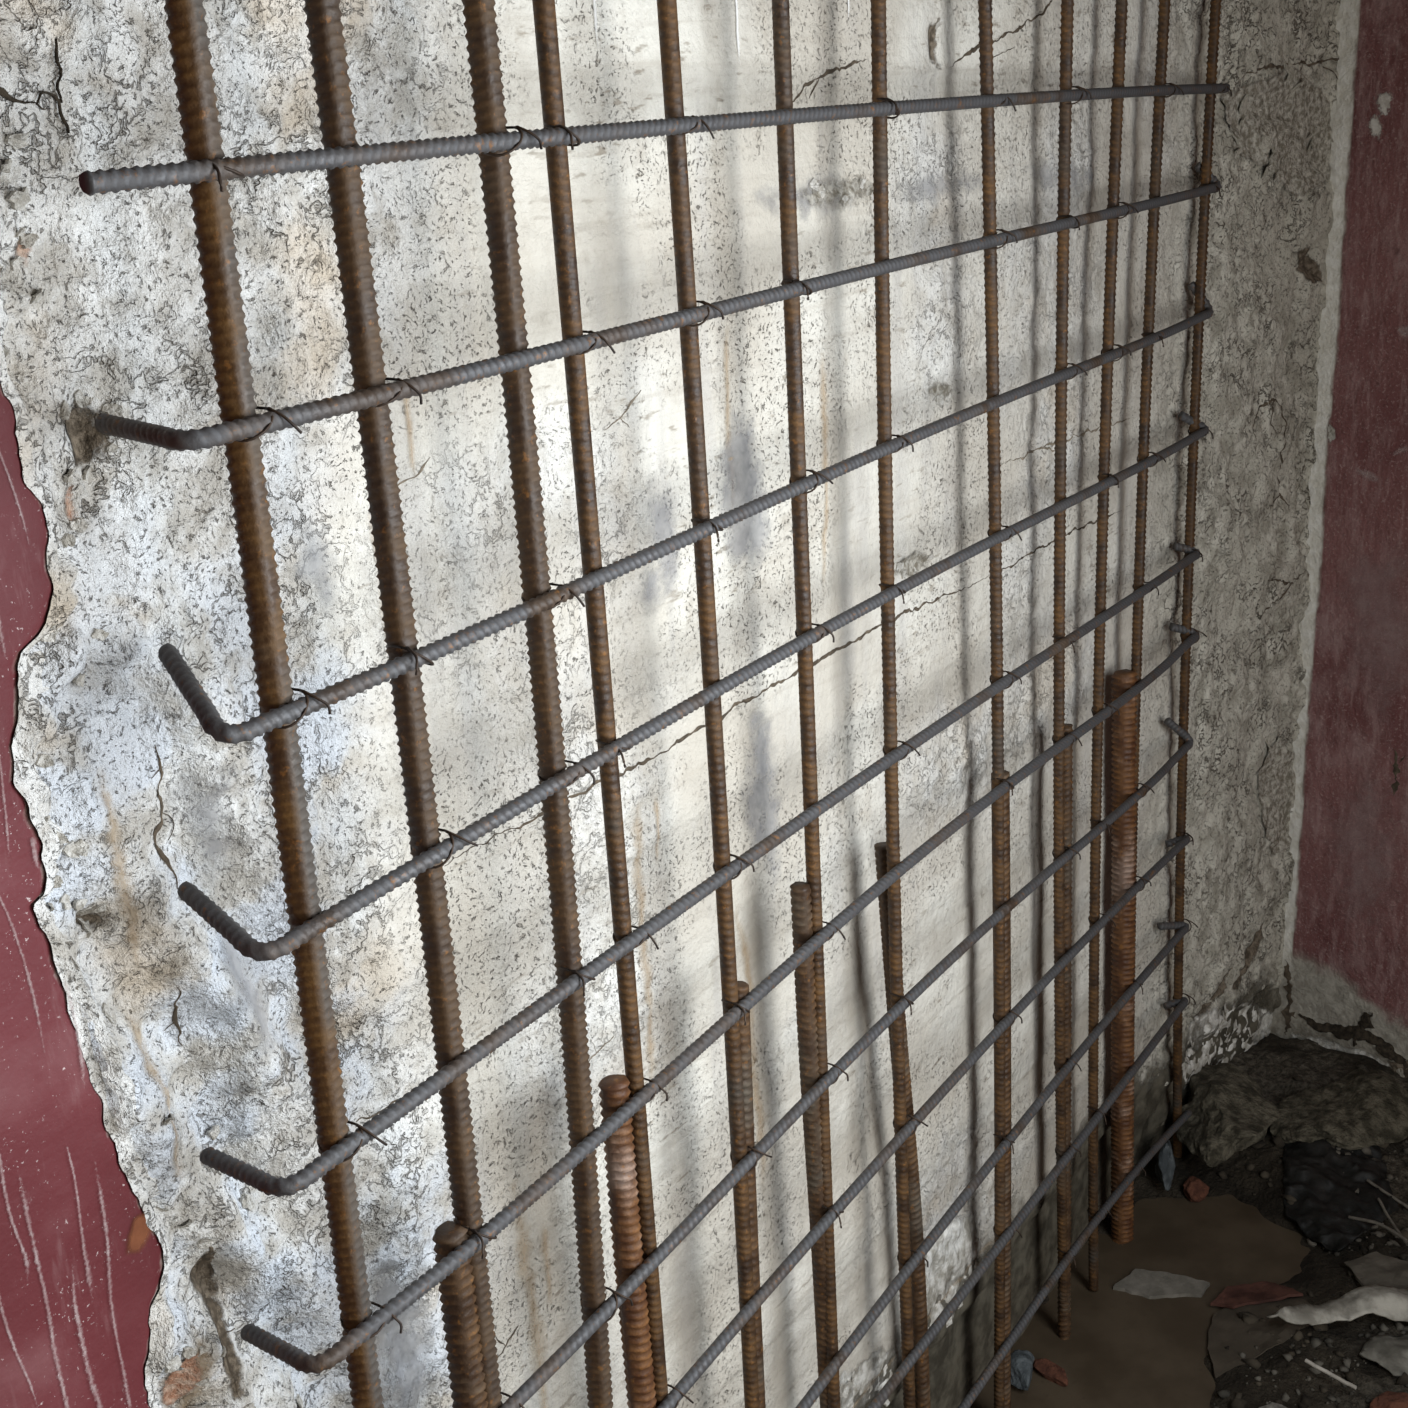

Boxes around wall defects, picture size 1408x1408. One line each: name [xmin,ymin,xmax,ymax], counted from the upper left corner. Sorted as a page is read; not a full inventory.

crack [0,39,70,133]
crack [793,59,866,102]
spalling [515,130,540,151]
spalling [1184,440,1199,547]
crack [445,510,1122,866]
spalling [0,186,212,1408]
spalling [1134,647,1198,932]
spalling [1182,969,1273,1093]
crack [356,1097,403,1122]
corrosion [129,1215,150,1252]
spalling [190,1237,245,1400]
peeling [1266,1284,1408,1377]